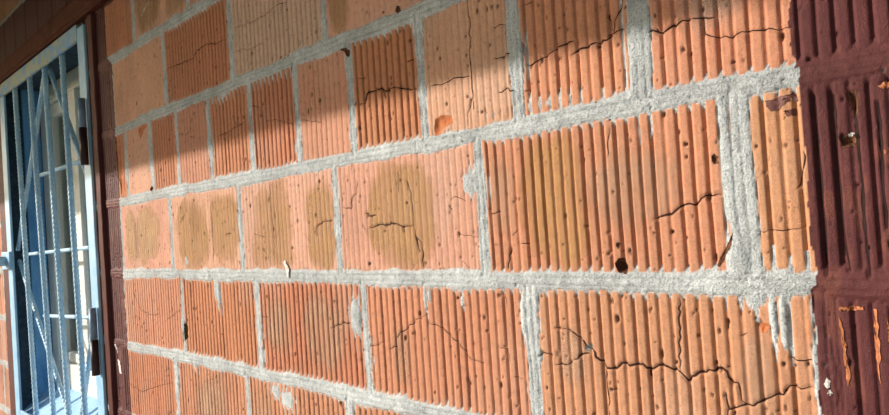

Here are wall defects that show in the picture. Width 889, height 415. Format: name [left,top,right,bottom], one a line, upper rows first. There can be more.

crack [360,0,474,113]
crack [530,0,623,66]
crack [648,17,788,39]
spalling [434,115,453,136]
water stain [178,199,237,266]
water stain [309,189,334,269]
crack [317,176,424,267]
water stain [369,168,431,263]
crack [372,314,482,363]
crack [539,298,815,415]
peeling [838,306,889,384]